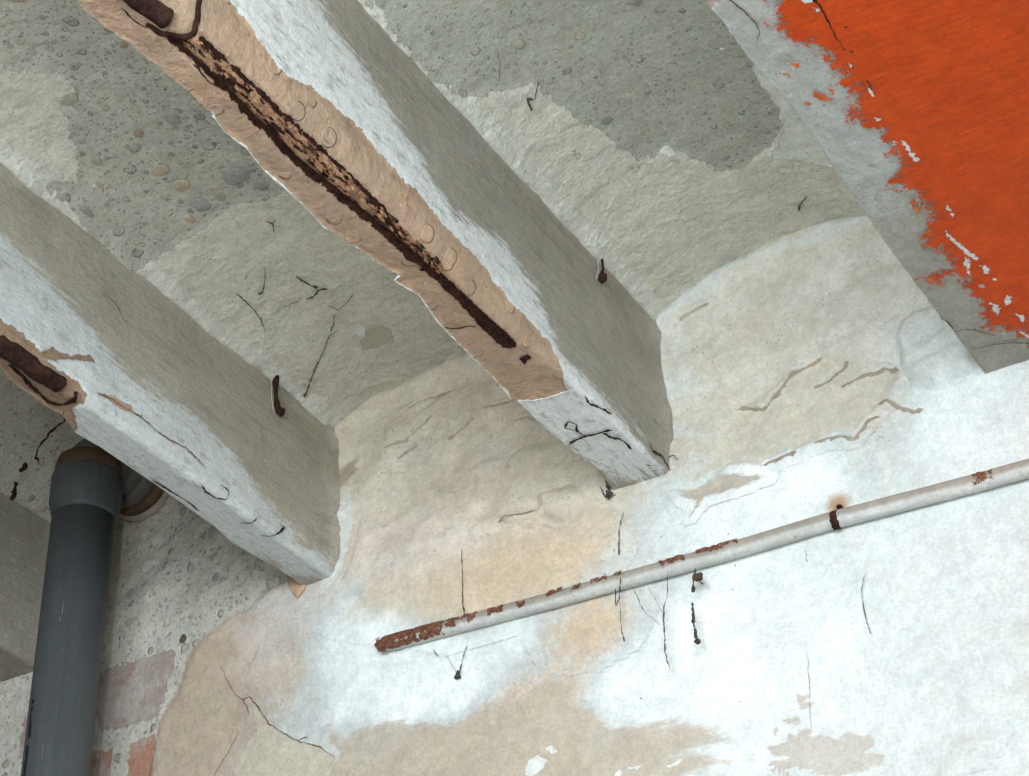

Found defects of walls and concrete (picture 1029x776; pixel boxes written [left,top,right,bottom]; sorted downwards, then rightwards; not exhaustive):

spalling [0,0,570,414]
flaking render [0,672,33,776]
flaking render [0,318,95,523]
damp [150,611,259,776]
flaking render [90,481,361,776]
rust [374,600,525,652]
damp [316,502,638,647]
damp [403,583,659,678]
rust [658,539,738,566]
rust [815,480,863,516]
damp [914,591,1029,776]
rust [971,469,994,485]